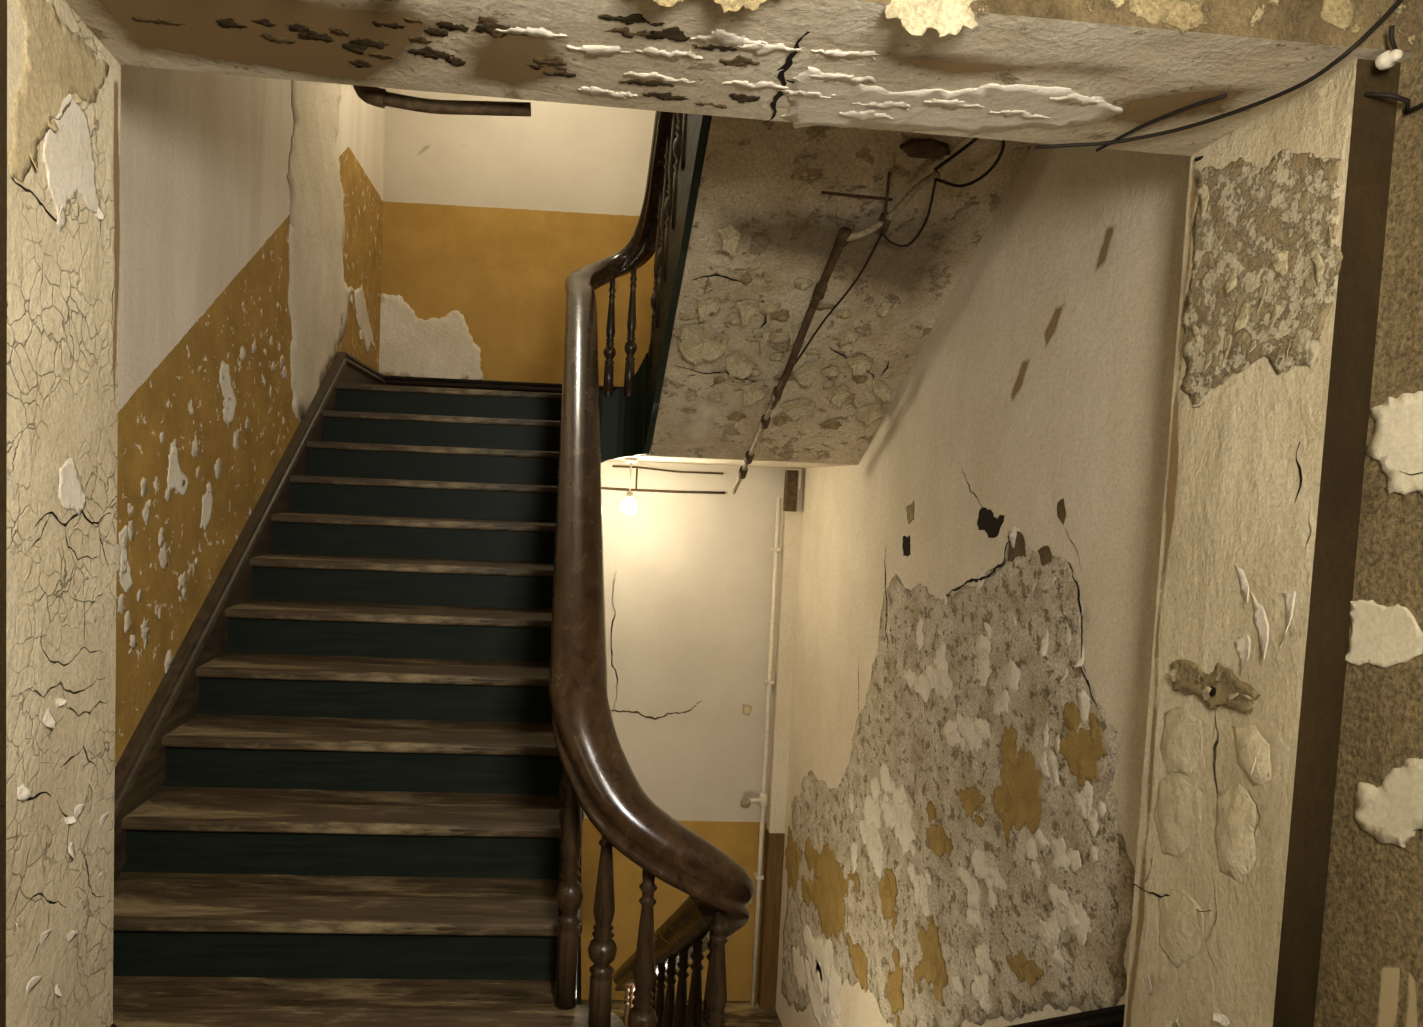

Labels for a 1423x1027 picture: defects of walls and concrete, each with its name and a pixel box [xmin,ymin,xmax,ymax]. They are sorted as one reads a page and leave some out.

peeling [8,0,109,232]
peeling [216,0,1123,133]
crack [763,31,810,124]
peeling [219,80,483,450]
peeling [1180,148,1343,405]
peeling [1366,391,1423,495]
crack [610,573,701,720]
peeling [1345,600,1423,668]
crack [0,510,111,965]
peeling [781,498,1135,1027]
peeling [1354,758,1423,847]
water stain [1378,967,1418,1027]